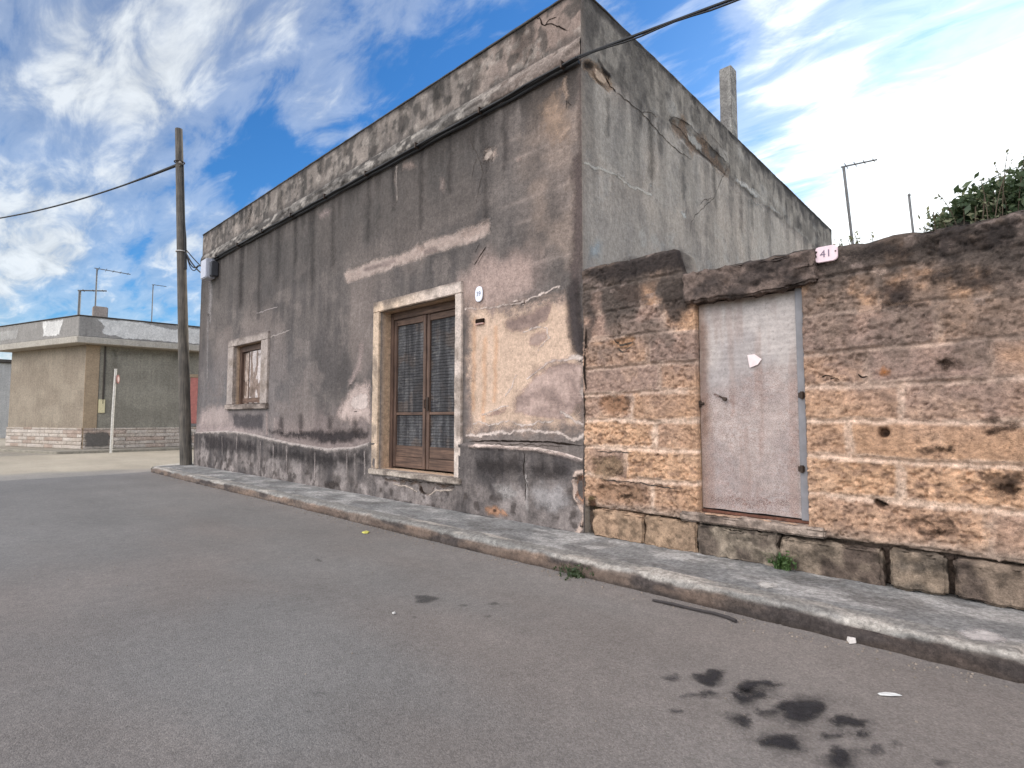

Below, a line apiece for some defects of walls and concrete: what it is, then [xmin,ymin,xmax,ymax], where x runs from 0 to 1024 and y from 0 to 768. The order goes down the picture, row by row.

crack [536,16,565,30]
crack [616,92,688,157]
crack [584,162,652,196]
spalling [669,116,780,214]
peeling [345,222,489,283]
peeling [338,347,372,425]
peeling [465,286,584,441]
leakage [195,413,368,477]
crack [469,440,632,509]
crack [601,478,676,489]